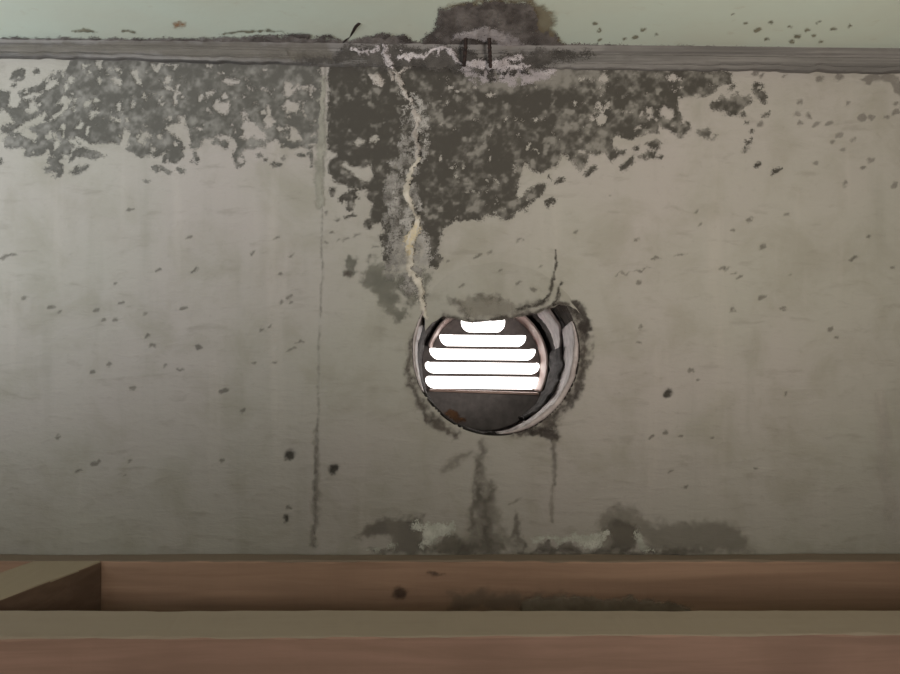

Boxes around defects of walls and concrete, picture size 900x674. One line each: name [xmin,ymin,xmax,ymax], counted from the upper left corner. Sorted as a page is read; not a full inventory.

water stain [285,0,597,76]
crack [351,43,446,320]
water stain [344,256,356,276]
water stain [364,265,417,321]
crack [517,250,562,310]
efflorescence [410,519,456,551]
efflorescence [530,529,610,550]